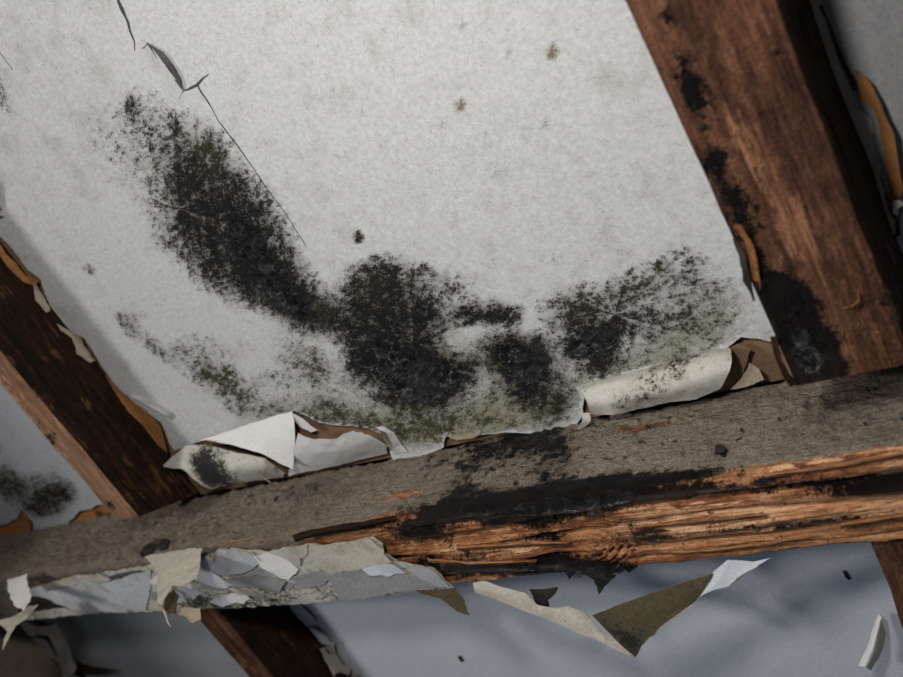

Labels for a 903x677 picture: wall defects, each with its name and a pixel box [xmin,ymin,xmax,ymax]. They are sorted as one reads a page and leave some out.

crack [117,0,306,246]
water stain [88,87,738,448]
mould [0,466,79,519]
peeling [17,536,454,620]